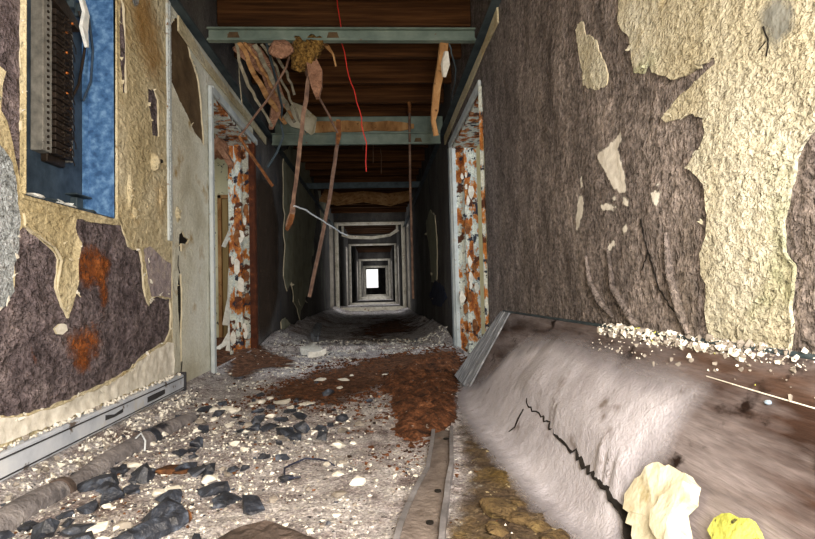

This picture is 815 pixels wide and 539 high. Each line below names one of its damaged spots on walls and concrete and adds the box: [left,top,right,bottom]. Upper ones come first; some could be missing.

rust [69,329,98,369]
flaking render [0,0,175,444]
rust [79,249,110,305]
rust [248,142,259,348]
rust [451,147,461,348]
peeling [617,0,815,353]